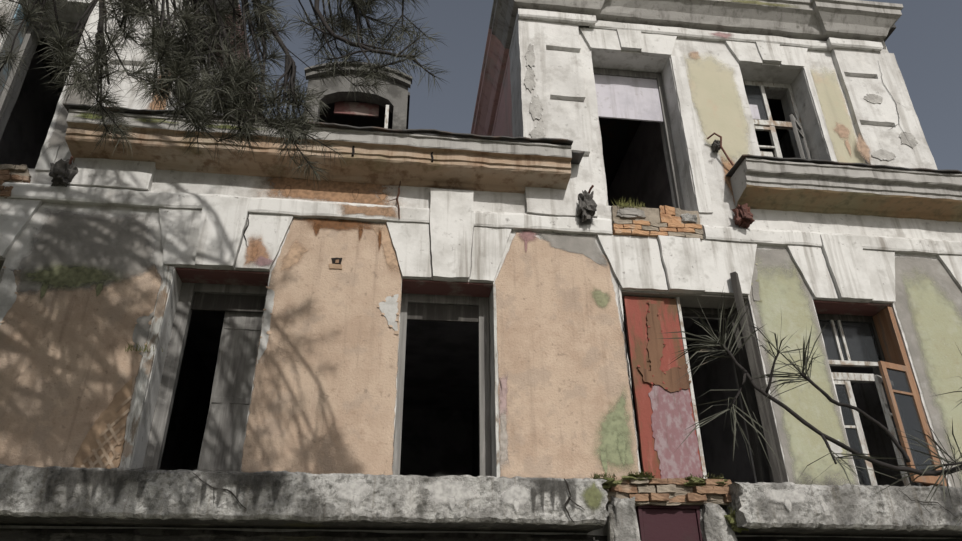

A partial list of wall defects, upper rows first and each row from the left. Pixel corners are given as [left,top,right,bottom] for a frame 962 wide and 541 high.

spalling [899,131,918,148]
spalling [0,164,31,198]
spalling [611,205,703,240]
peeling [0,266,18,325]
peeling [257,286,275,364]
peeling [377,294,399,334]
peeling [637,301,691,393]
peeling [828,438,846,460]
water stain [46,467,149,501]
water stain [200,470,286,505]
crack [564,478,585,523]